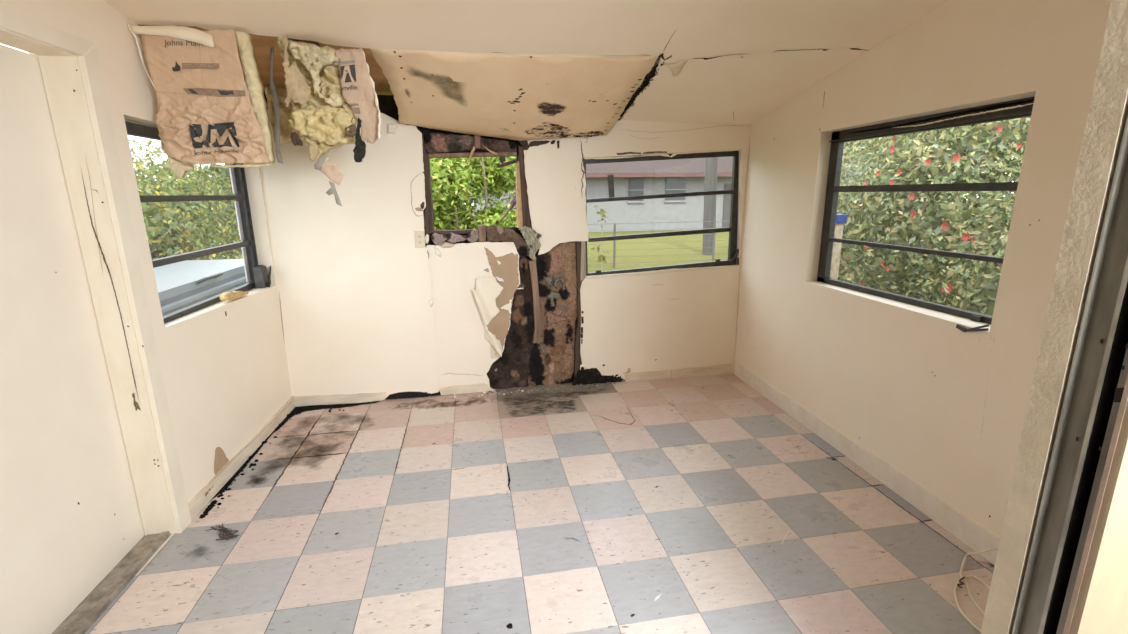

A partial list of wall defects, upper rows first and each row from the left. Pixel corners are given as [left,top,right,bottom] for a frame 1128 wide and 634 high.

leakage [413,71,462,100]
leakage [519,79,642,150]
crack [775,46,870,54]
crack [579,137,588,198]
crack [618,60,750,359]
spalling [472,241,588,389]
peeling [197,403,291,496]
leakage [209,401,380,502]